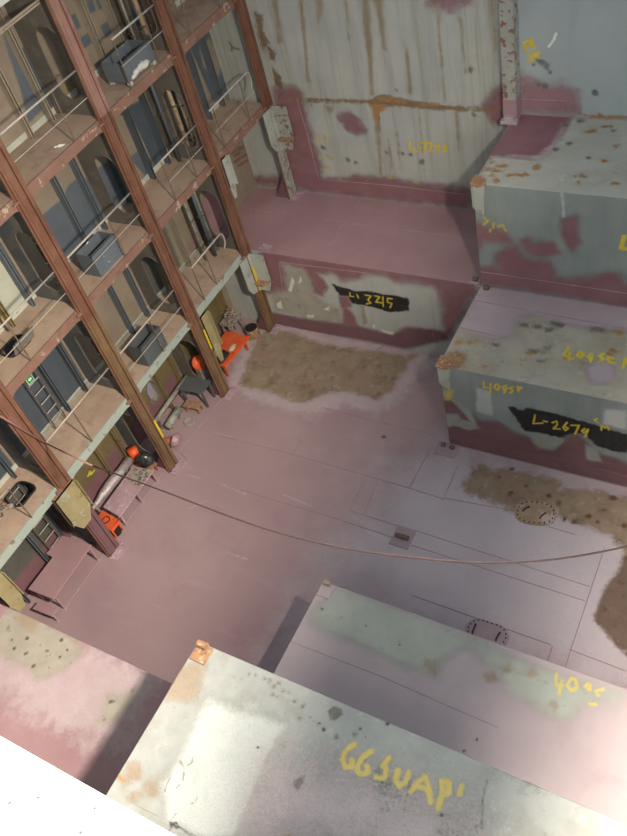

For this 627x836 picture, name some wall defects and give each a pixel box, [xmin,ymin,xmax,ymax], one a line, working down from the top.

corrosion [286,0,503,175]
corrosion [485,160,546,183]
peeling [271,267,344,324]
peeling [446,388,494,431]
peeling [603,408,627,429]
peeling [531,434,564,451]